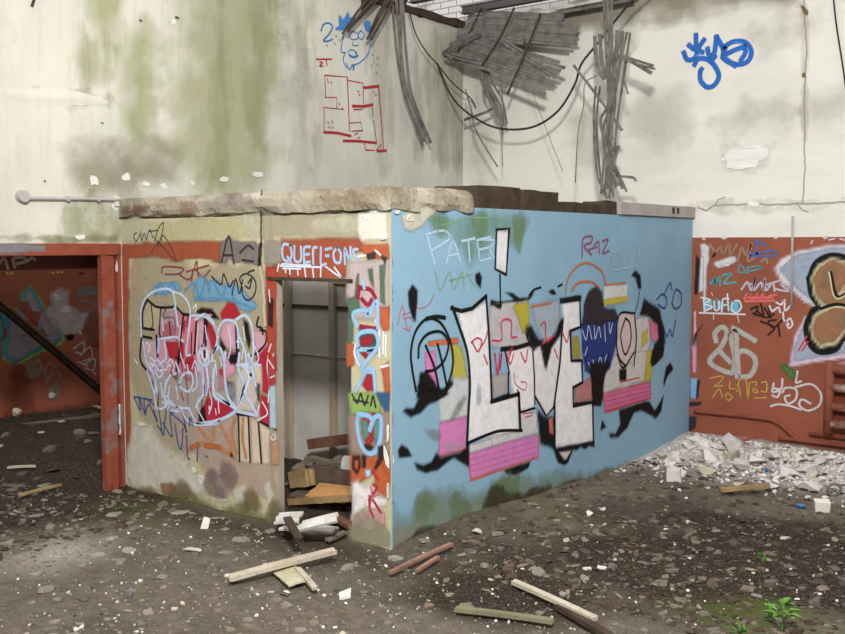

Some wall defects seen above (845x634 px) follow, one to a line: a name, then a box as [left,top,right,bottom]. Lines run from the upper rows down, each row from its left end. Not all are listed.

leakage [131,40,149,135]
leakage [187,0,277,184]
spalling [721,145,769,170]
leakage [80,163,121,190]
leakage [123,213,358,242]
leakage [128,256,284,525]
peeling [125,422,208,494]
peeling [216,475,248,505]
leakage [482,486,551,509]